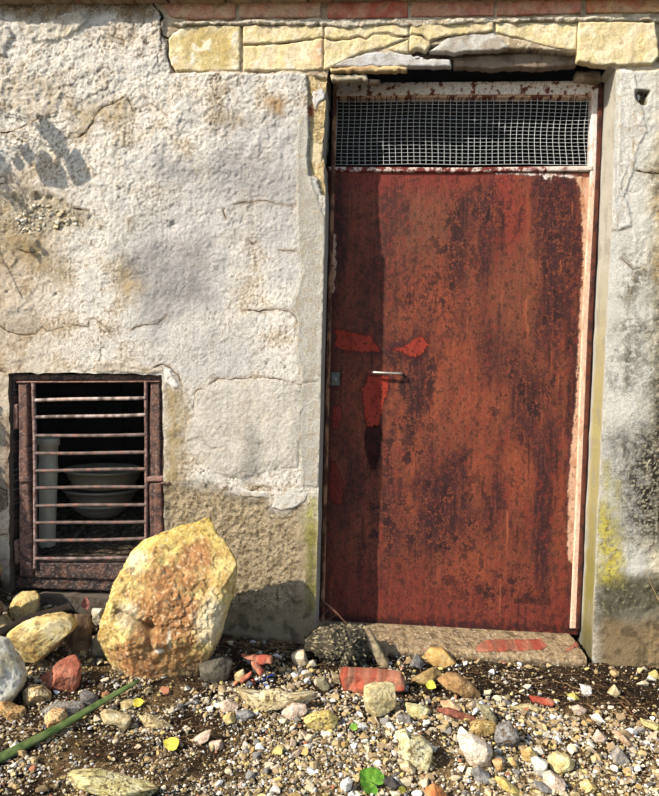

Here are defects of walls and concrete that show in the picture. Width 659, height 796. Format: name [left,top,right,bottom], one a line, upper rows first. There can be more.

crack [79,97,164,137]
crack [1,318,163,335]
spalling [164,33,601,613]
corrosion [364,425,383,469]